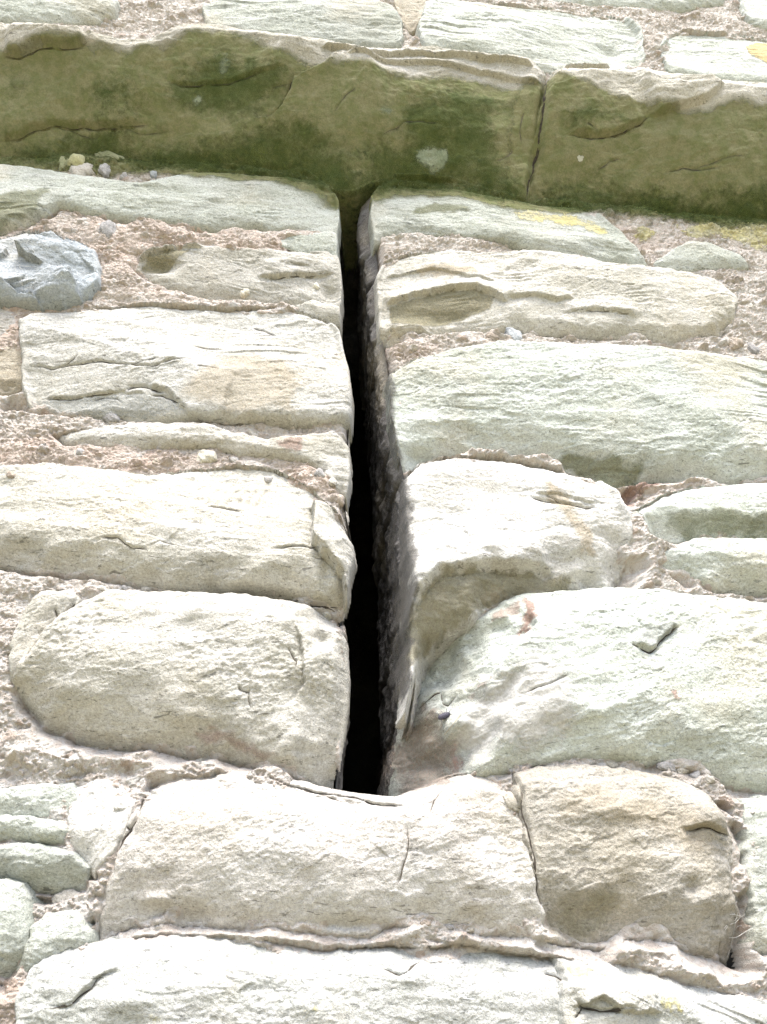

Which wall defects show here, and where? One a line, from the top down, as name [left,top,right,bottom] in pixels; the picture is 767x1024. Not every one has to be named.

crack [498,84,547,199]